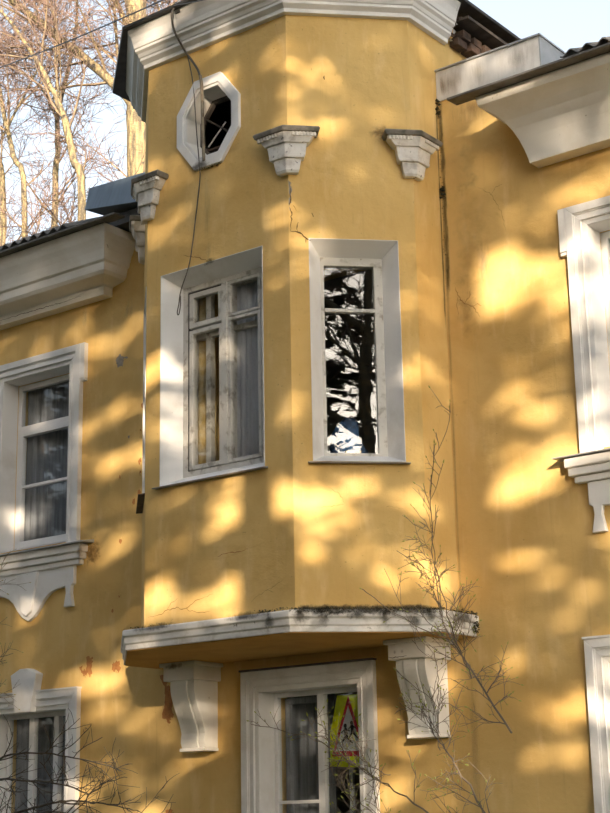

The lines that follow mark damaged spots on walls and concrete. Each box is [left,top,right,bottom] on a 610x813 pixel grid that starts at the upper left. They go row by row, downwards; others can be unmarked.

crack [148,594,211,618]
peeling [160,675,174,726]